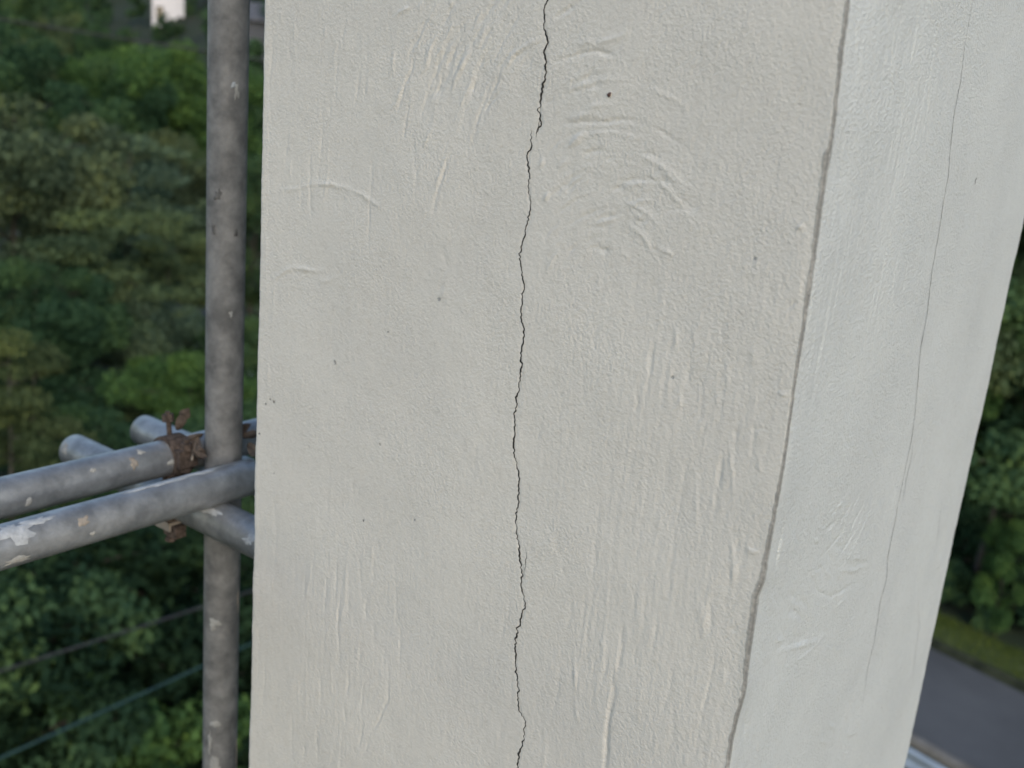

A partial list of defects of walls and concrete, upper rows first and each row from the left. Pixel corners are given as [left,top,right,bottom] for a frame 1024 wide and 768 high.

crack [513,0,549,768]